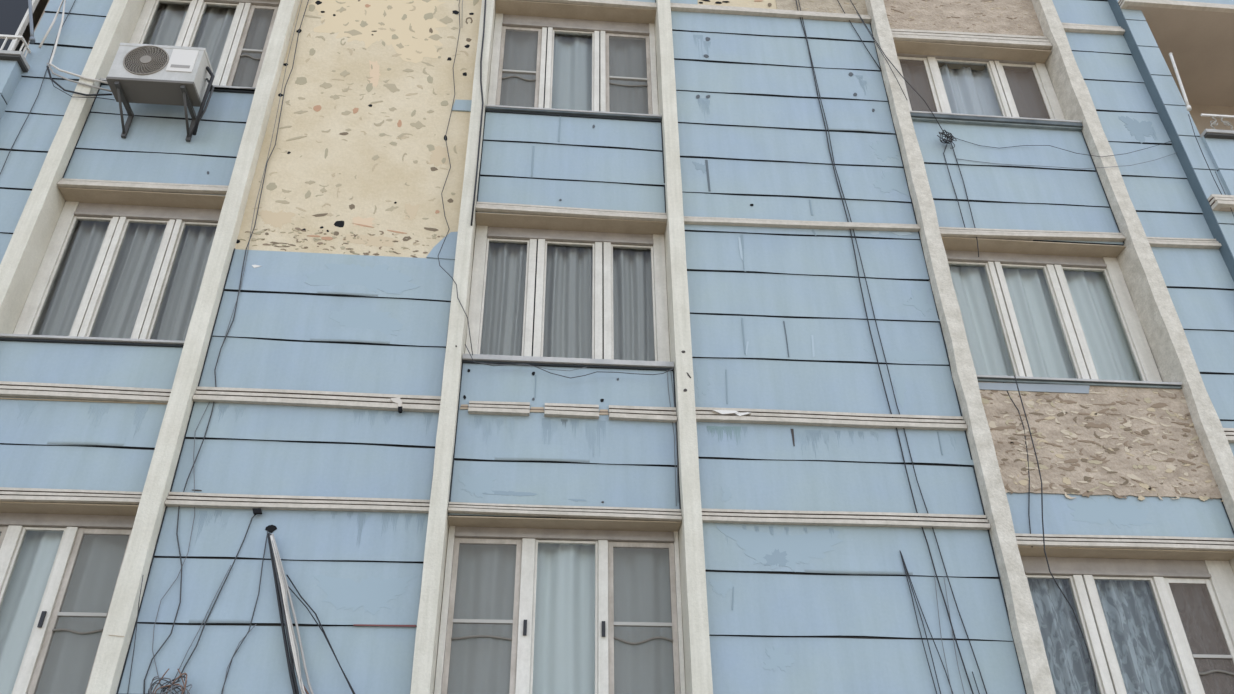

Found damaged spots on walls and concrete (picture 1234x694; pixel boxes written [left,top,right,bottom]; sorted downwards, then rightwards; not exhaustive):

spalling [670,0,870,24]
spalling [883,0,1050,51]
spalling [235,0,482,260]
spalling [978,382,1224,502]